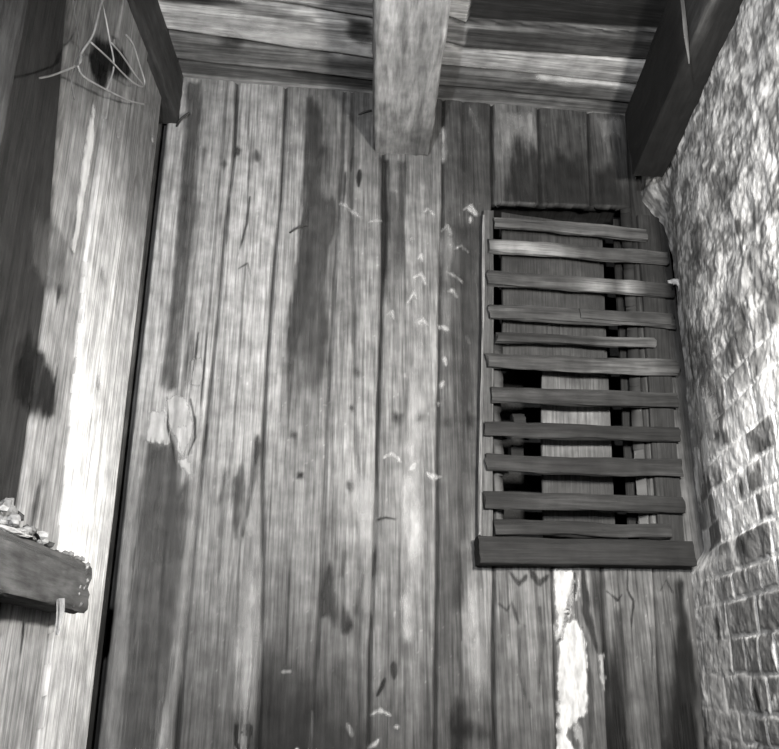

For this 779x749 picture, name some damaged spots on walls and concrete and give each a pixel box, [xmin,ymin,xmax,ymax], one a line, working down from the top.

water stain [288,99,335,376]
peeling [190,357,202,385]
peeling [146,395,192,475]
peeling [512,569,588,749]
peeling [598,654,606,691]